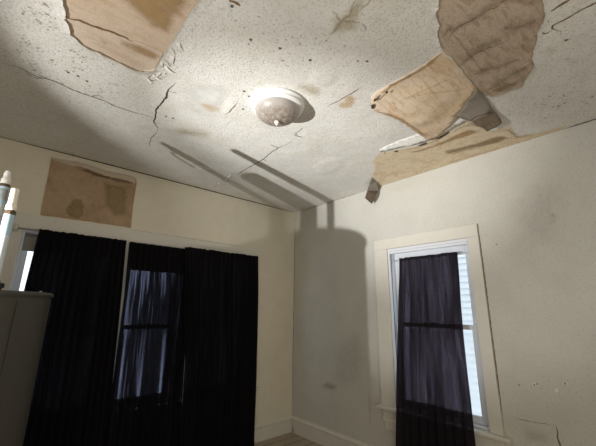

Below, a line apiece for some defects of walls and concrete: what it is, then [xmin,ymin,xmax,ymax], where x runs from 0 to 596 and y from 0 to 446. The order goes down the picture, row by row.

peeling [51,0,213,84]
crack [542,0,596,34]
crack [1,62,175,144]
peeling [365,0,565,204]
crack [2,129,302,212]